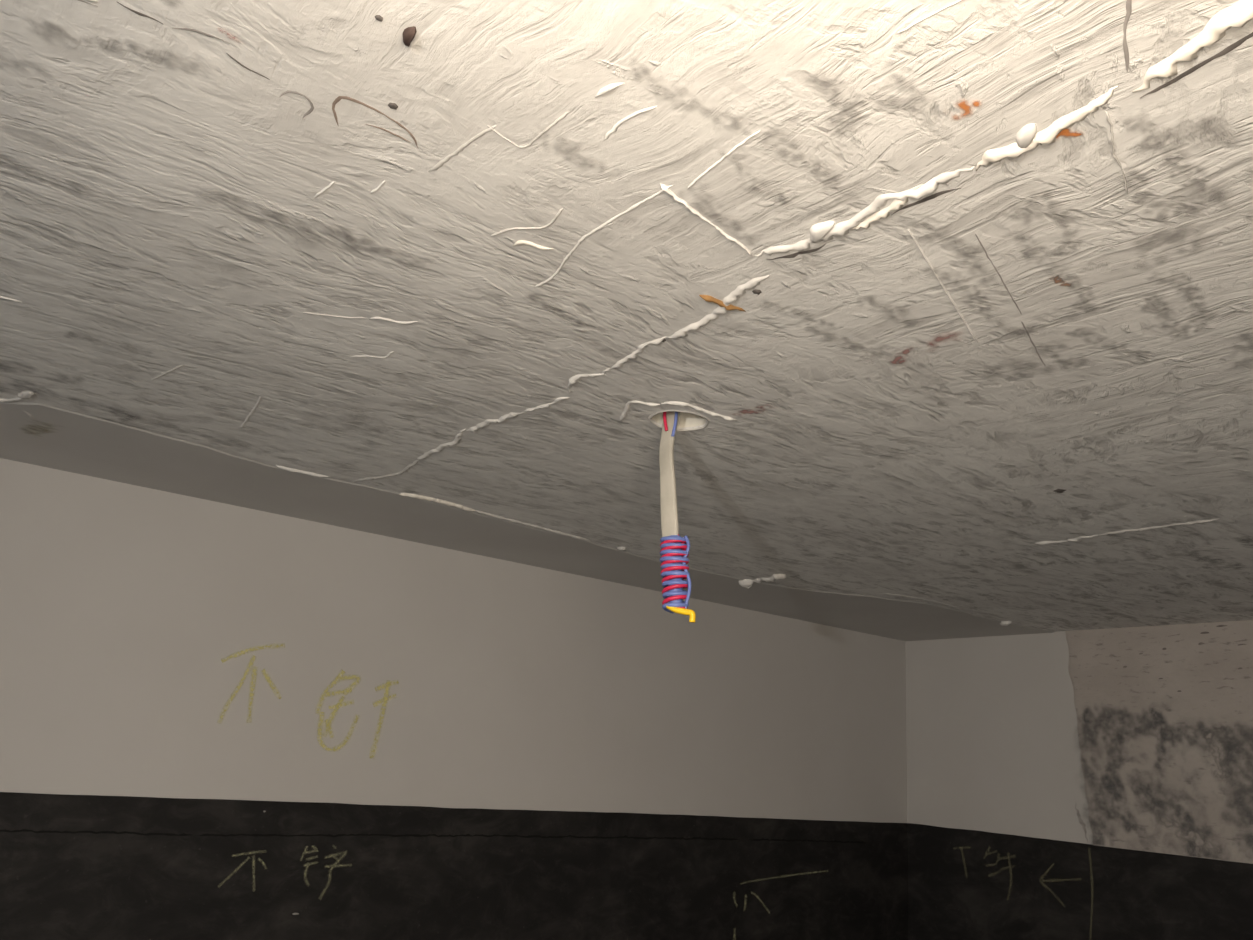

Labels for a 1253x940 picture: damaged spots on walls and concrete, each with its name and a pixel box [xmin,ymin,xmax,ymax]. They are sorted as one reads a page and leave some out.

crack [78,0,270,80]
crack [354,0,1253,482]
water stain [1083,710,1253,856]